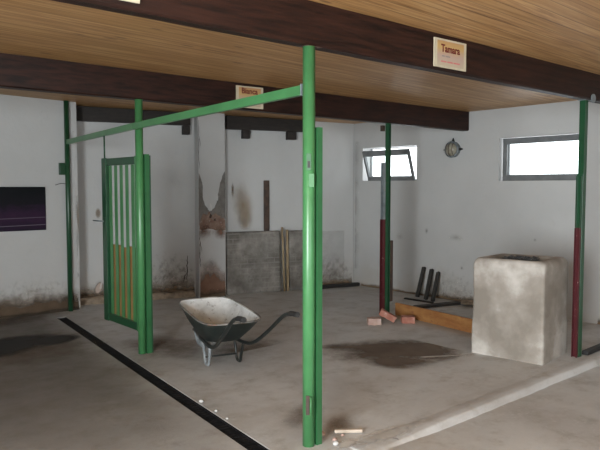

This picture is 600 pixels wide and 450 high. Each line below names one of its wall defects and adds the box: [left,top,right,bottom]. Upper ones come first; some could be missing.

flaking render [199,172,226,236]
water stain [152,272,226,298]
water stain [0,289,104,319]
water stain [323,341,474,368]